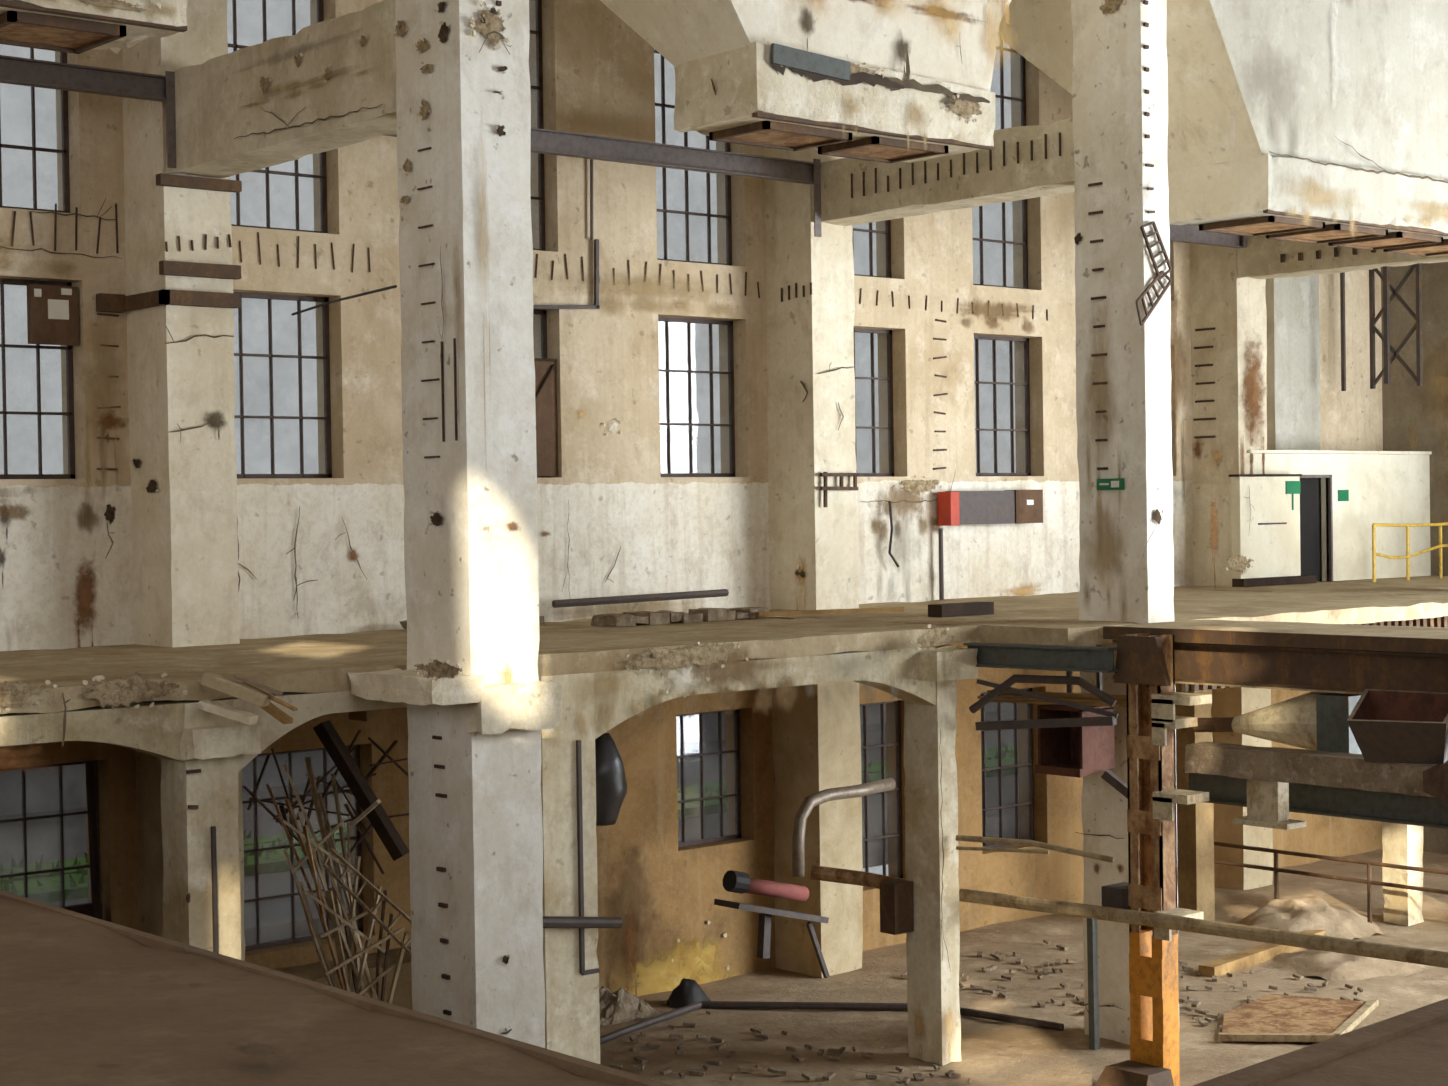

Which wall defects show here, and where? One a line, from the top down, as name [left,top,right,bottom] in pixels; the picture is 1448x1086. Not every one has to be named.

spalling [395,0,450,73]
spalling [469,0,510,95]
spalling [770,43,904,89]
rust [913,2,1009,30]
crack [234,104,383,139]
spalling [945,94,982,124]
rust [1242,343,1265,474]
rust [1193,441,1221,460]
rust [75,562,95,648]
spalling [0,680,57,713]
spalling [82,672,188,709]
spalling [619,642,748,698]